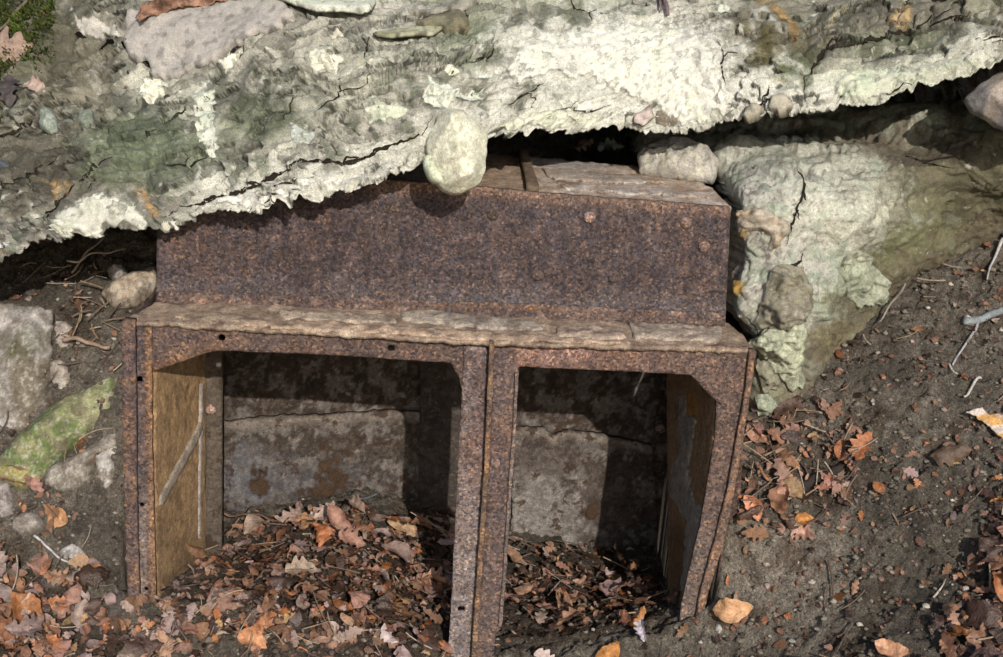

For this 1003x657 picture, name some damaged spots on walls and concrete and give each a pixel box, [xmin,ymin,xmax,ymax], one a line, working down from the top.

crack [803,0,1003,103]
crack [0,121,40,138]
crack [0,160,55,191]
crack [35,157,112,225]
corrosion [250,467,270,497]
corrosion [311,455,349,498]